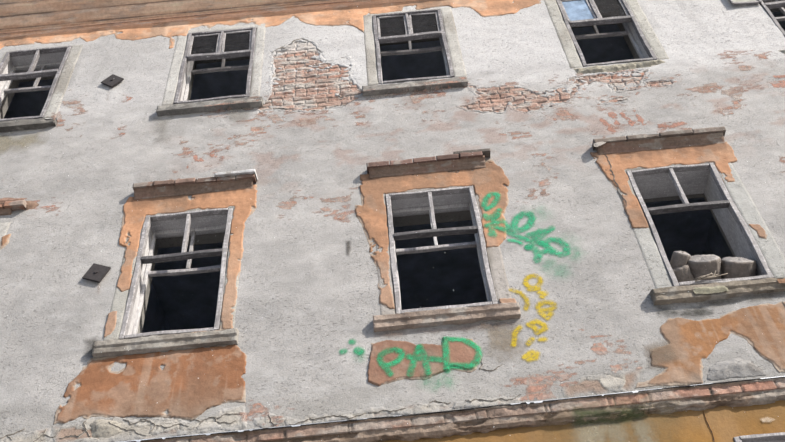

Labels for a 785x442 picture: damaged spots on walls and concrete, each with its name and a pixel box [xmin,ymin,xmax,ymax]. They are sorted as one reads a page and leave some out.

peeling [0,0,541,49]
flaking render [177,39,678,173]
flaking render [687,75,785,116]
peeling [590,141,737,228]
peeling [276,153,557,309]
peeling [116,184,258,331]
peeling [0,302,785,442]
crack [0,419,90,442]
crack [109,413,238,436]
crack [268,408,406,425]
crack [430,394,521,405]
crack [703,412,715,442]